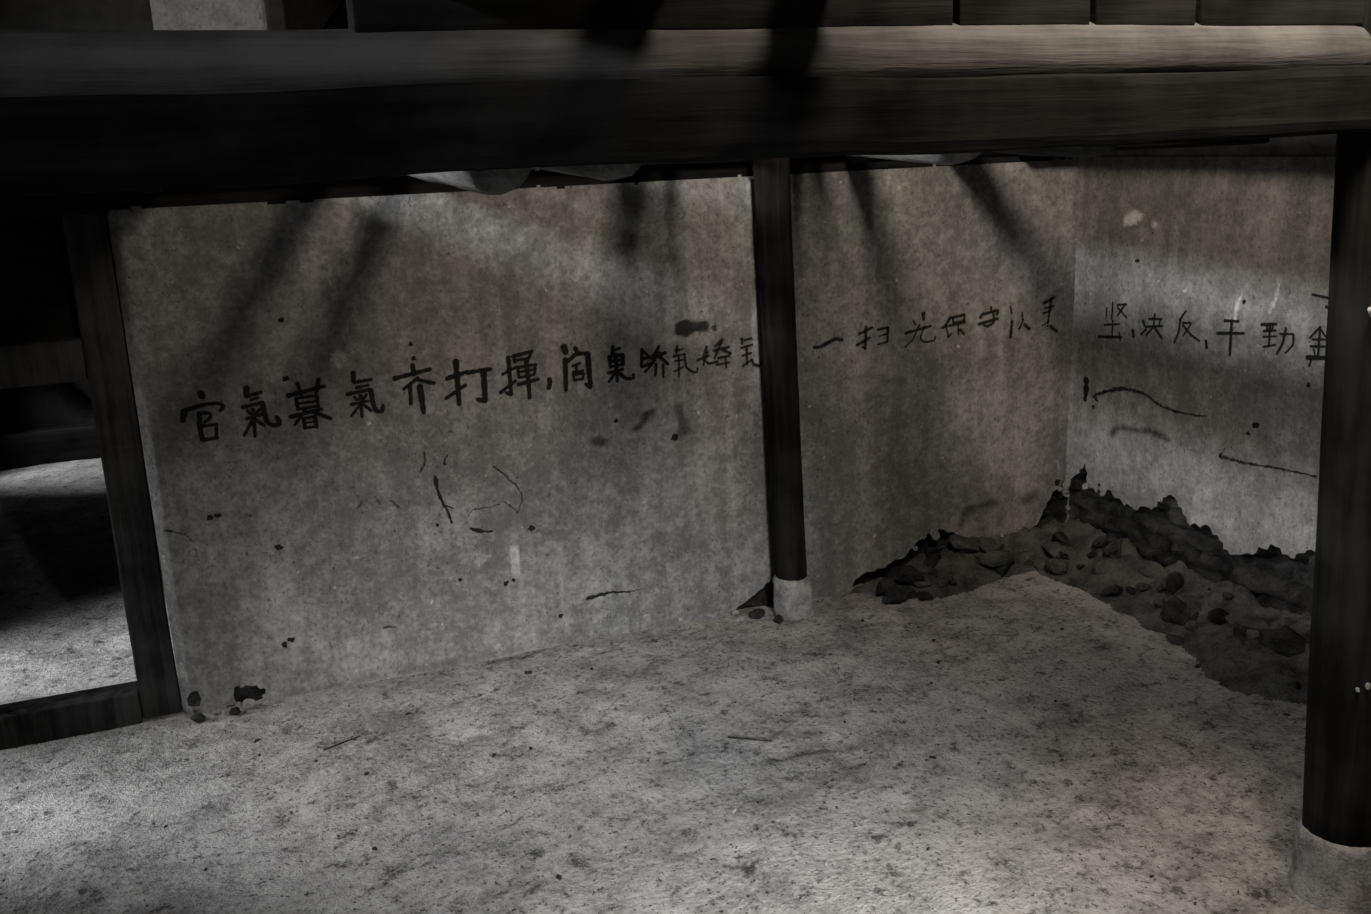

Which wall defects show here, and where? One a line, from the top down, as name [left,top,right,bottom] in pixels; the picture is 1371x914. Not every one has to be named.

spalling [853,529,956,587]
spalling [1033,464,1315,616]